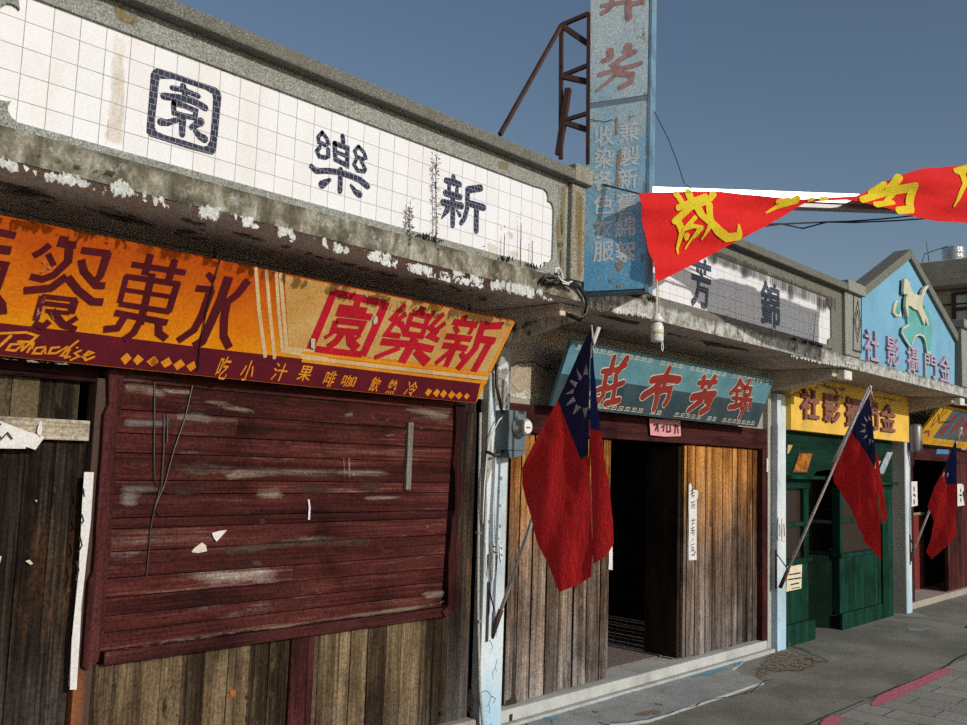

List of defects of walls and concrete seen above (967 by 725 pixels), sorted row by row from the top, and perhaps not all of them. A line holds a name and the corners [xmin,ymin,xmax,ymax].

peeling [0,155,169,208]
crack [599,645,829,725]